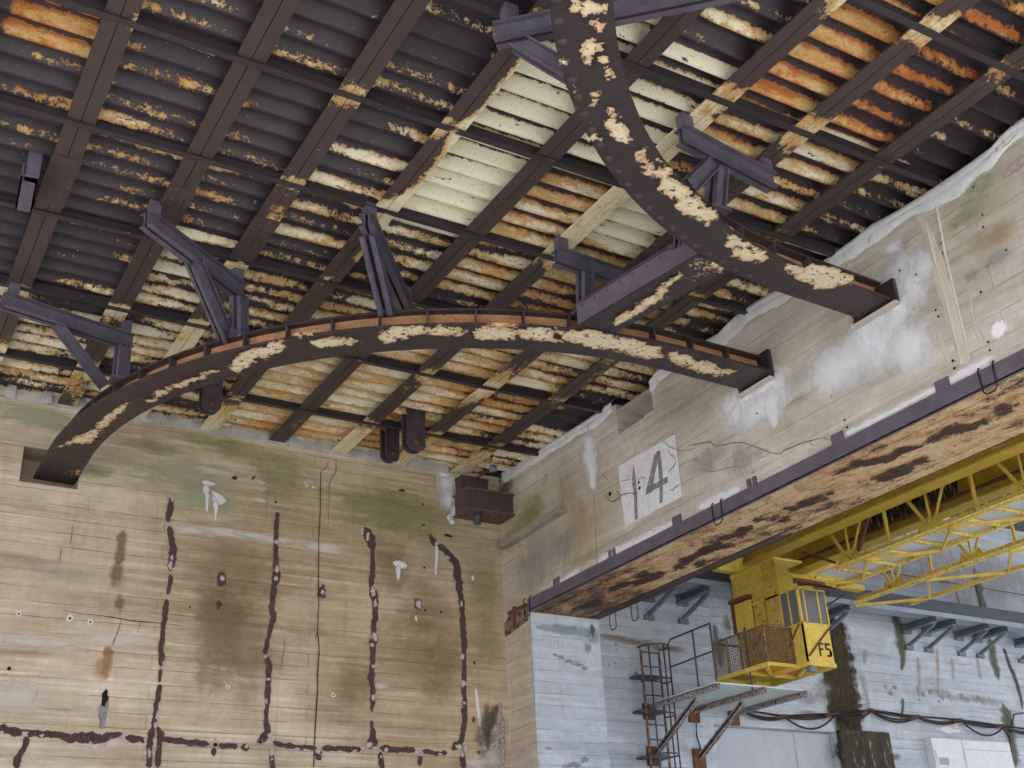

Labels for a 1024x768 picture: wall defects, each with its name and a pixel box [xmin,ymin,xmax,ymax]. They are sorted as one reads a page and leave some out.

leakage [810,205,1007,396]
leakage [712,368,787,431]
leakage [846,386,935,436]
leakage [583,435,597,490]
crack [601,438,827,502]
leakage [698,486,741,511]
leakage [112,532,126,581]
crack [266,461,337,768]
leakage [551,521,672,587]
leakage [973,568,986,607]
leakage [822,617,864,730]